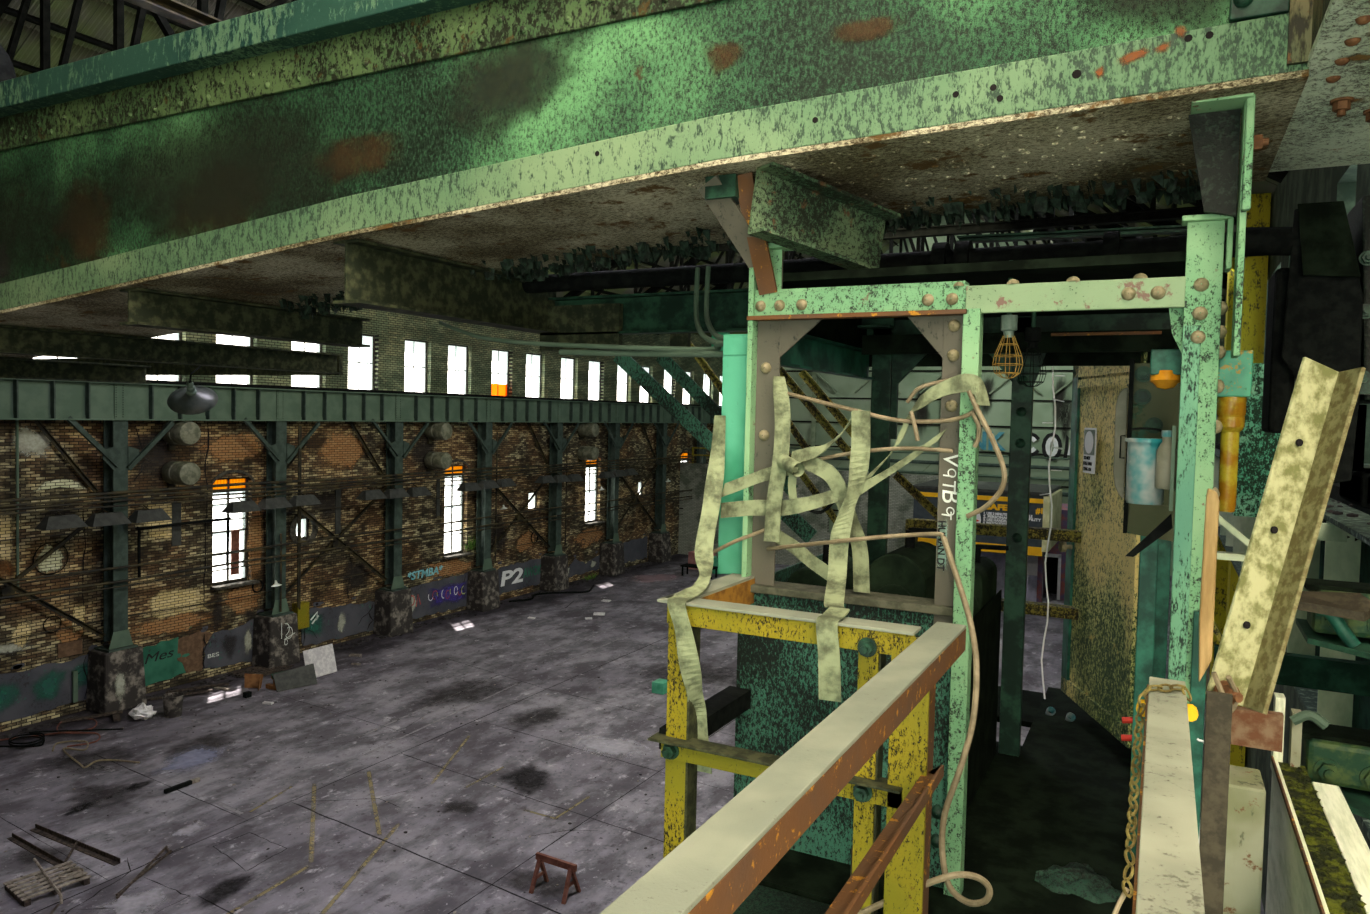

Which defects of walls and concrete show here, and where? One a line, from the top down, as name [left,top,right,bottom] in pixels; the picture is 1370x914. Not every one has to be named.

rust [836,18,892,41]
rust [708,44,739,71]